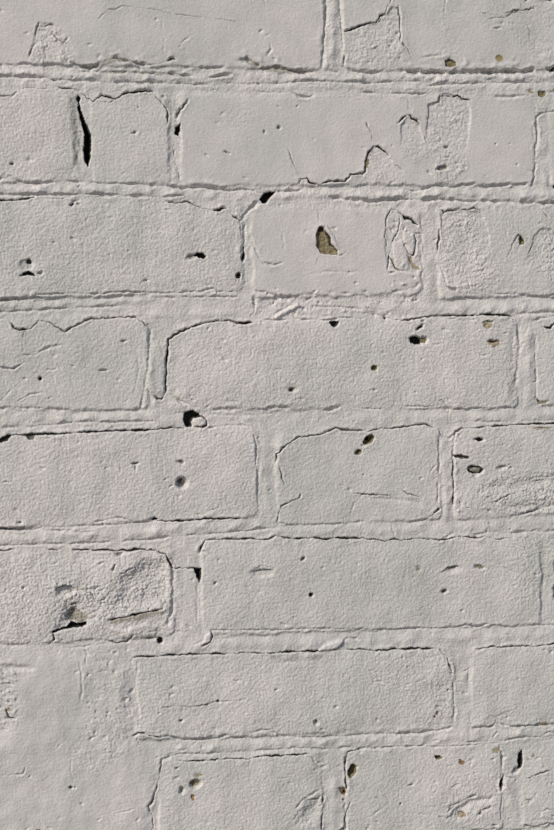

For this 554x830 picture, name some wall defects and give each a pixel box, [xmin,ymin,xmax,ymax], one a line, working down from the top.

crack [59,87,188,139]
peeling [316,227,337,255]
peeling [384,209,422,274]
crack [165,323,204,391]
spalling [183,410,199,427]
crack [275,433,324,521]
crack [148,760,208,828]